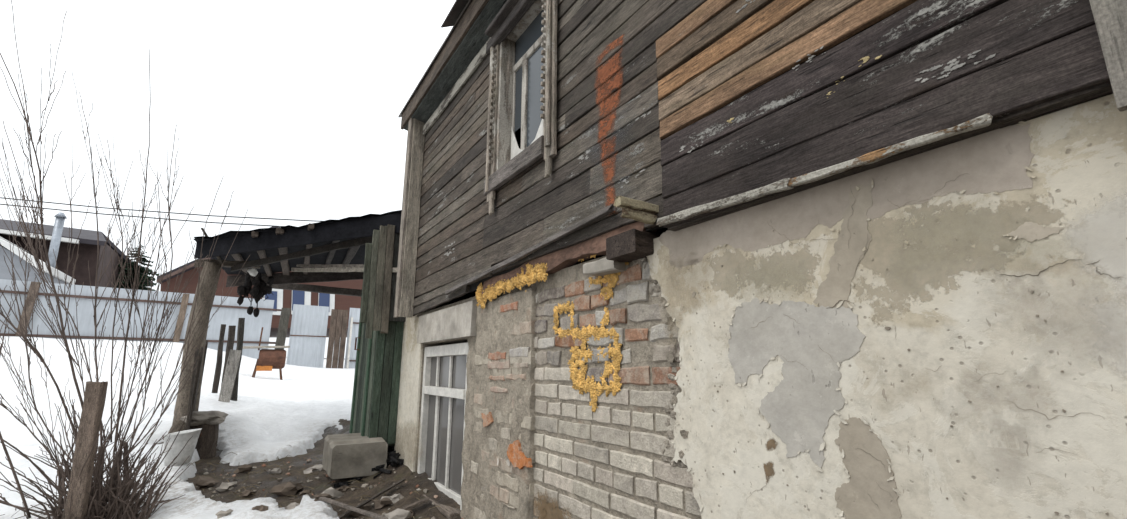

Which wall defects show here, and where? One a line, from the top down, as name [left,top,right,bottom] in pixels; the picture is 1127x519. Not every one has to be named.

rust [594,34,624,213]
peeling [915,48,996,83]
spalling [497,440,533,469]
spalling [632,258,694,487]
peeling [659,121,1071,519]
crack [1000,259,1120,278]